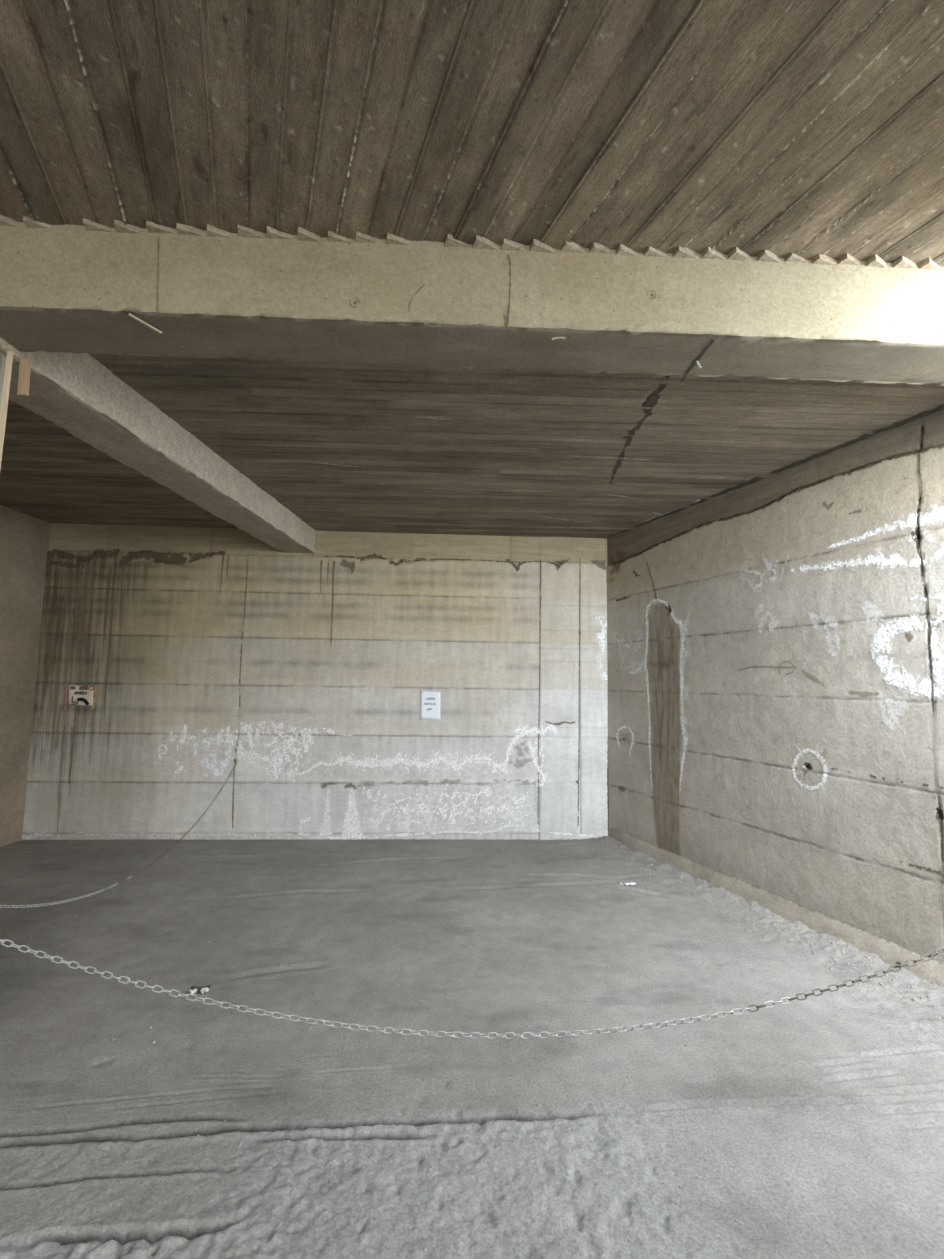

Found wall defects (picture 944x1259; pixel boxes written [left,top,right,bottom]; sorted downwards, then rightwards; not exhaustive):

crack [609,340,715,484]
water stain [38,549,228,795]
water stain [22,720,602,839]
water stain [595,599,690,855]
water stain [809,608,840,656]
water stain [740,505,944,591]
water stain [862,594,944,729]
crack [911,426,934,709]
crack [936,801,944,868]